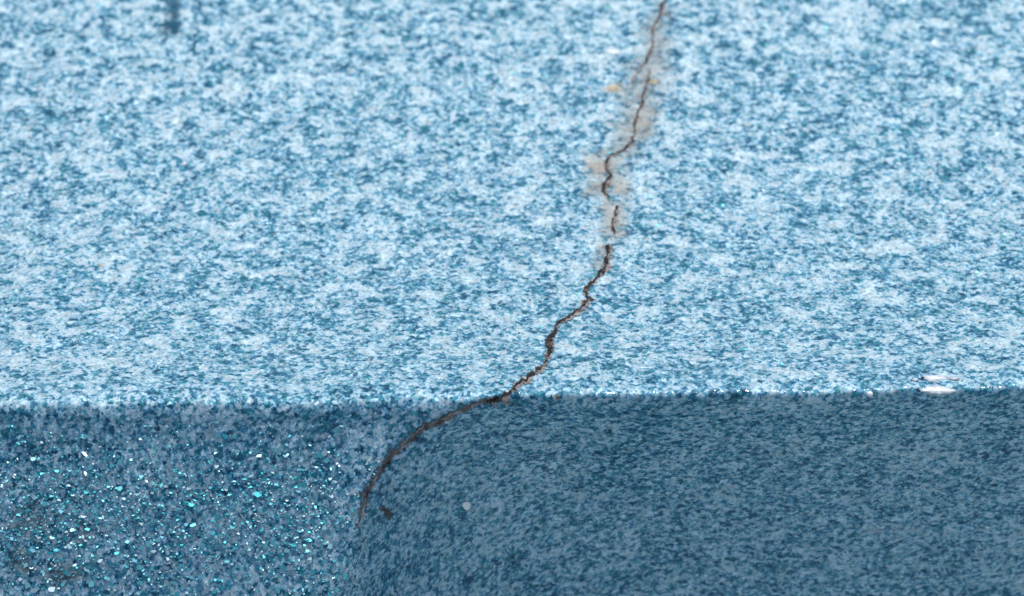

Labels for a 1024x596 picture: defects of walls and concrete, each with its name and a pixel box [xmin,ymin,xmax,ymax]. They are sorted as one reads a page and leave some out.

crack [357,1,665,526]